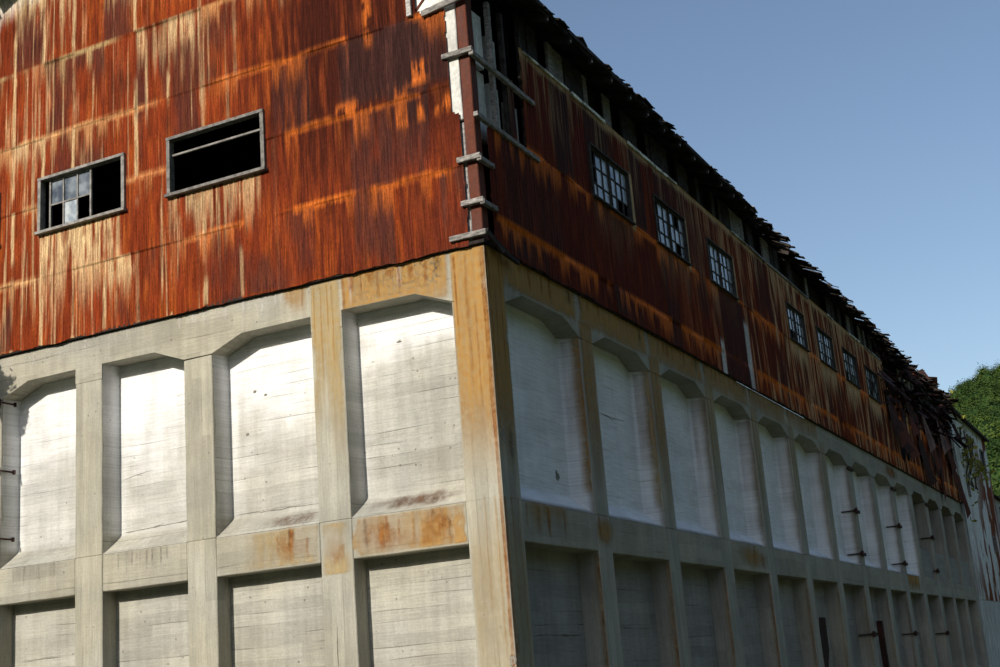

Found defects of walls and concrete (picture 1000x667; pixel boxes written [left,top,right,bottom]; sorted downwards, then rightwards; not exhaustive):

corrosion [311,245,747,502]
corrosion [261,518,313,565]
corrosion [398,492,466,547]